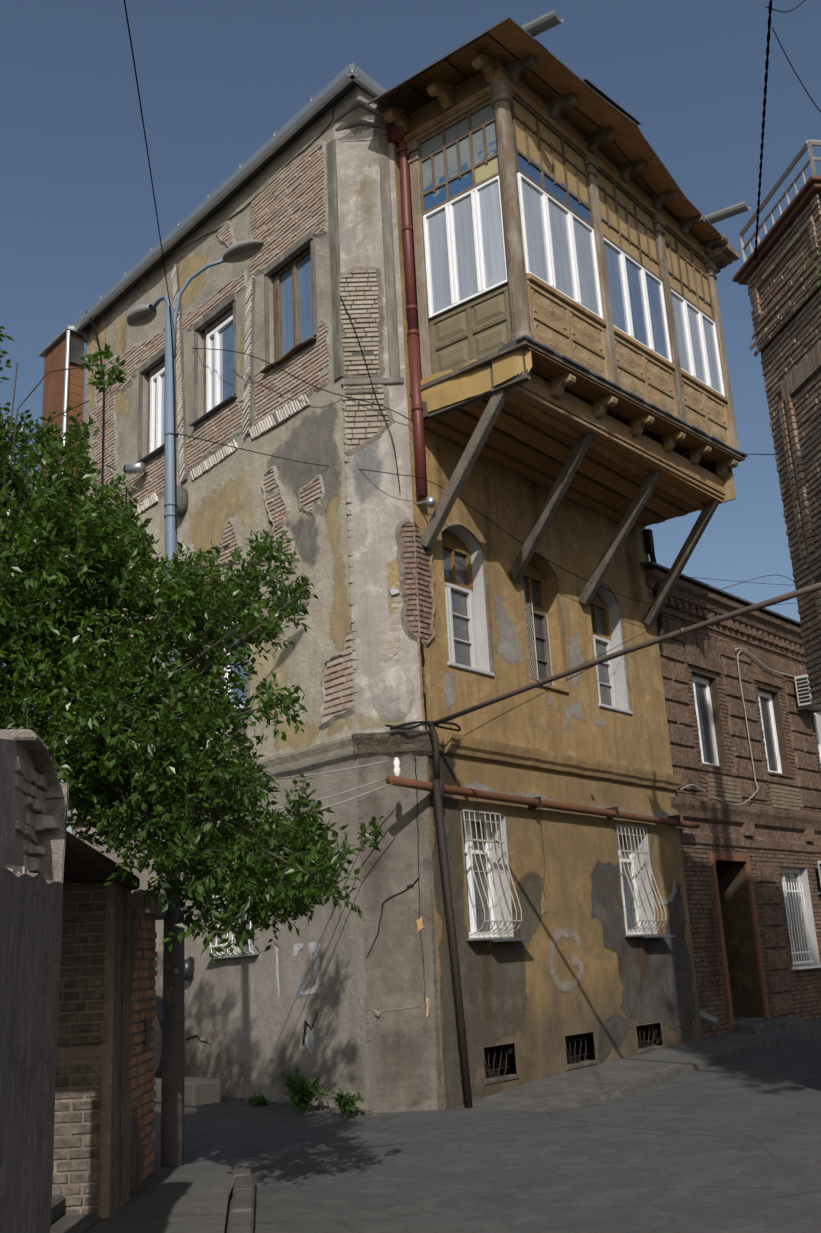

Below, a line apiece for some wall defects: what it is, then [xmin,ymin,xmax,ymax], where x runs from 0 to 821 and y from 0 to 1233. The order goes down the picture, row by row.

spalling [89,108,395,516]
spalling [189,465,405,749]
spalling [373,518,436,677]
peeling [494,594,523,664]